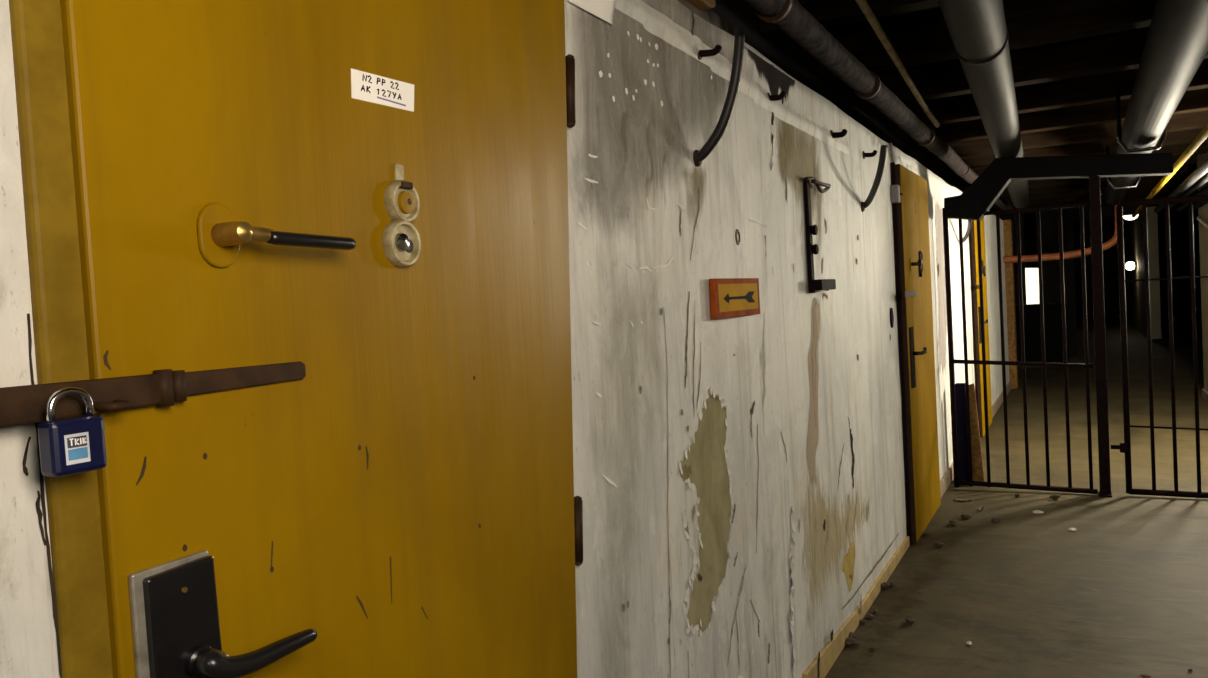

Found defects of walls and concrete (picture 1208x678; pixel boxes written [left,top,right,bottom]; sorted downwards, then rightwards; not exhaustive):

peeling [679,388,732,636]
peeling [789,483,869,678]